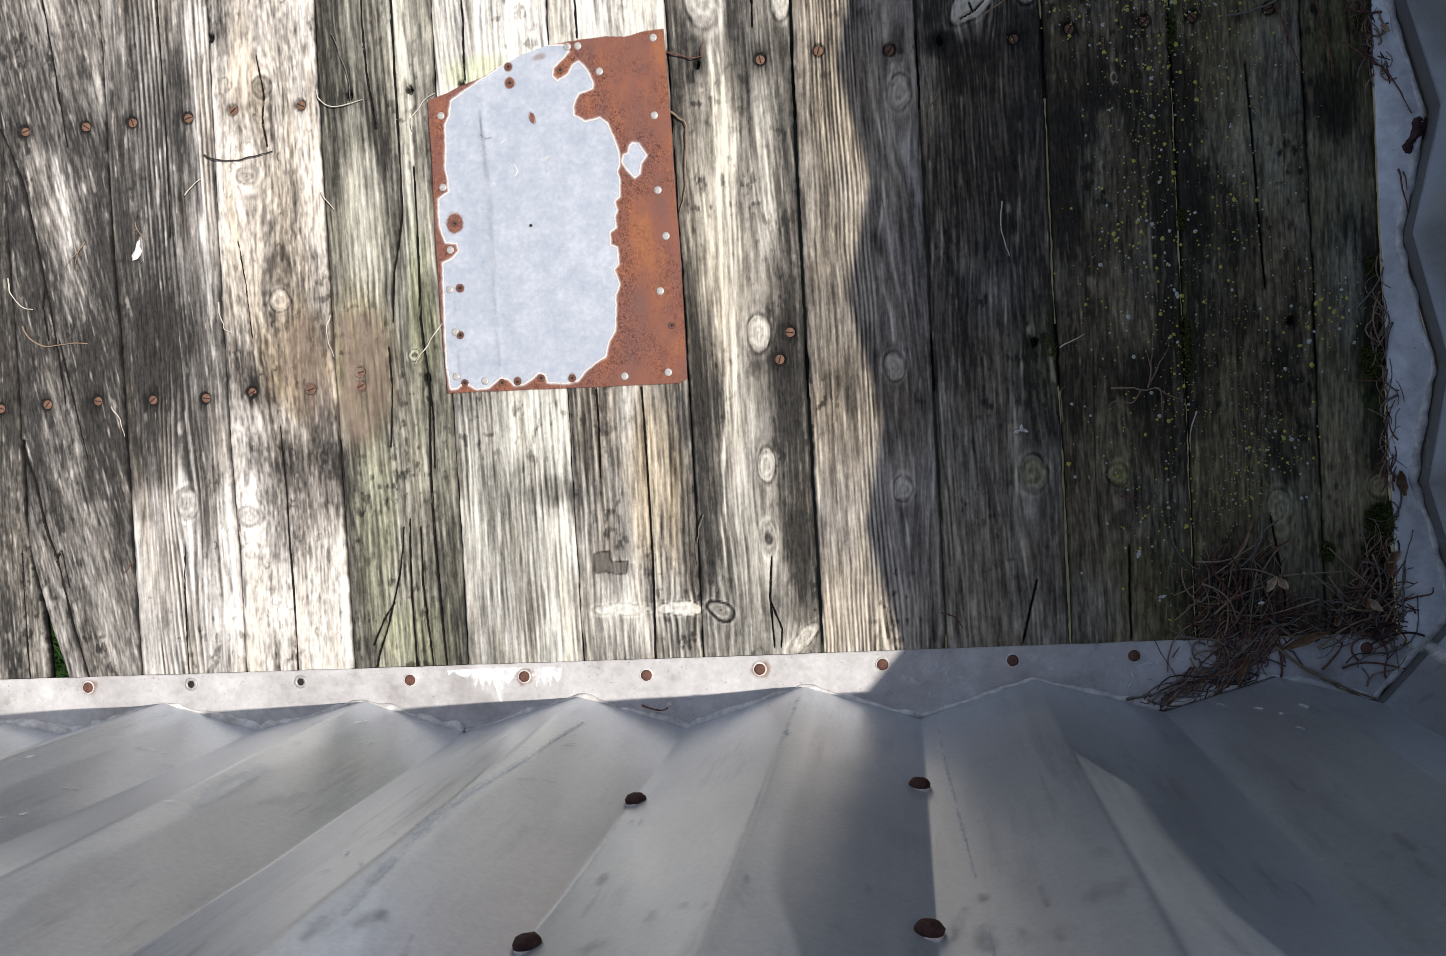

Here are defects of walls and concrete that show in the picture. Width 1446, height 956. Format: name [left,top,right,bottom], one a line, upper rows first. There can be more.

rust [428,29,687,393]
crack [21,450,90,679]